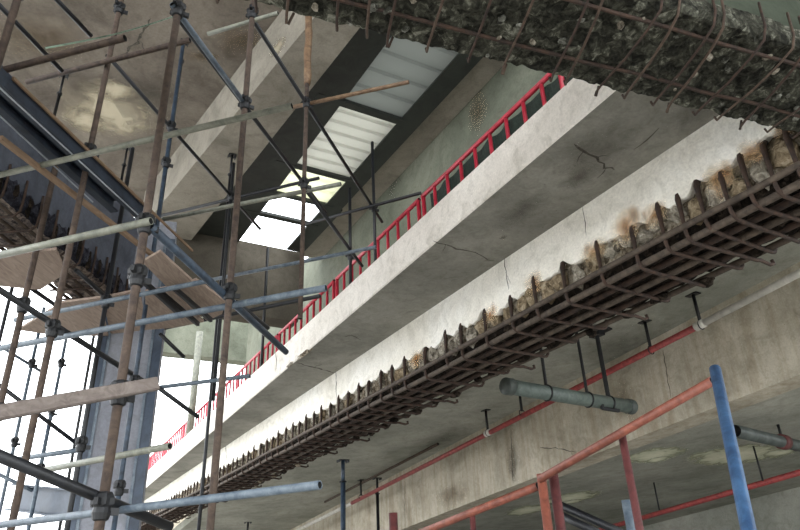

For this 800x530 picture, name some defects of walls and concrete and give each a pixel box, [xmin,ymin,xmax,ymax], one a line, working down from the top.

crack [574,144,614,176]
crack [434,241,509,289]
spalling [152,0,800,519]